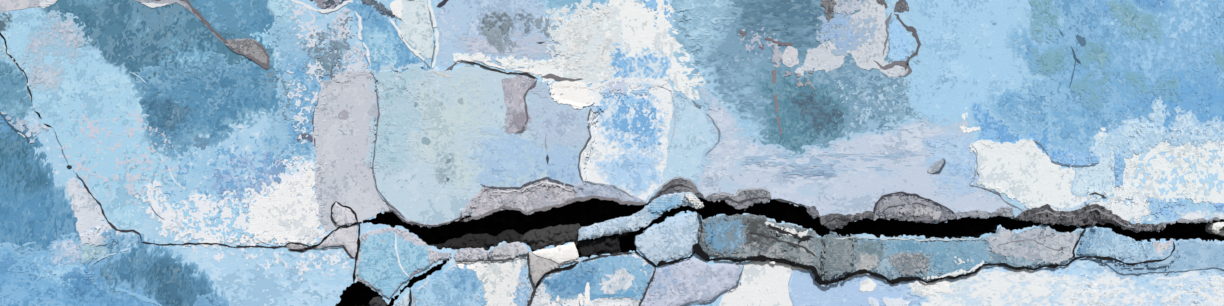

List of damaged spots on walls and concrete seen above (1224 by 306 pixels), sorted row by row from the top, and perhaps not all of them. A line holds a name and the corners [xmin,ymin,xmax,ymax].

peeling [820,0,862,20]
peeling [159,33,218,80]
peeling [784,12,878,77]
peeling [888,16,918,62]
peeling [833,80,894,127]
crack [76,174,1224,306]